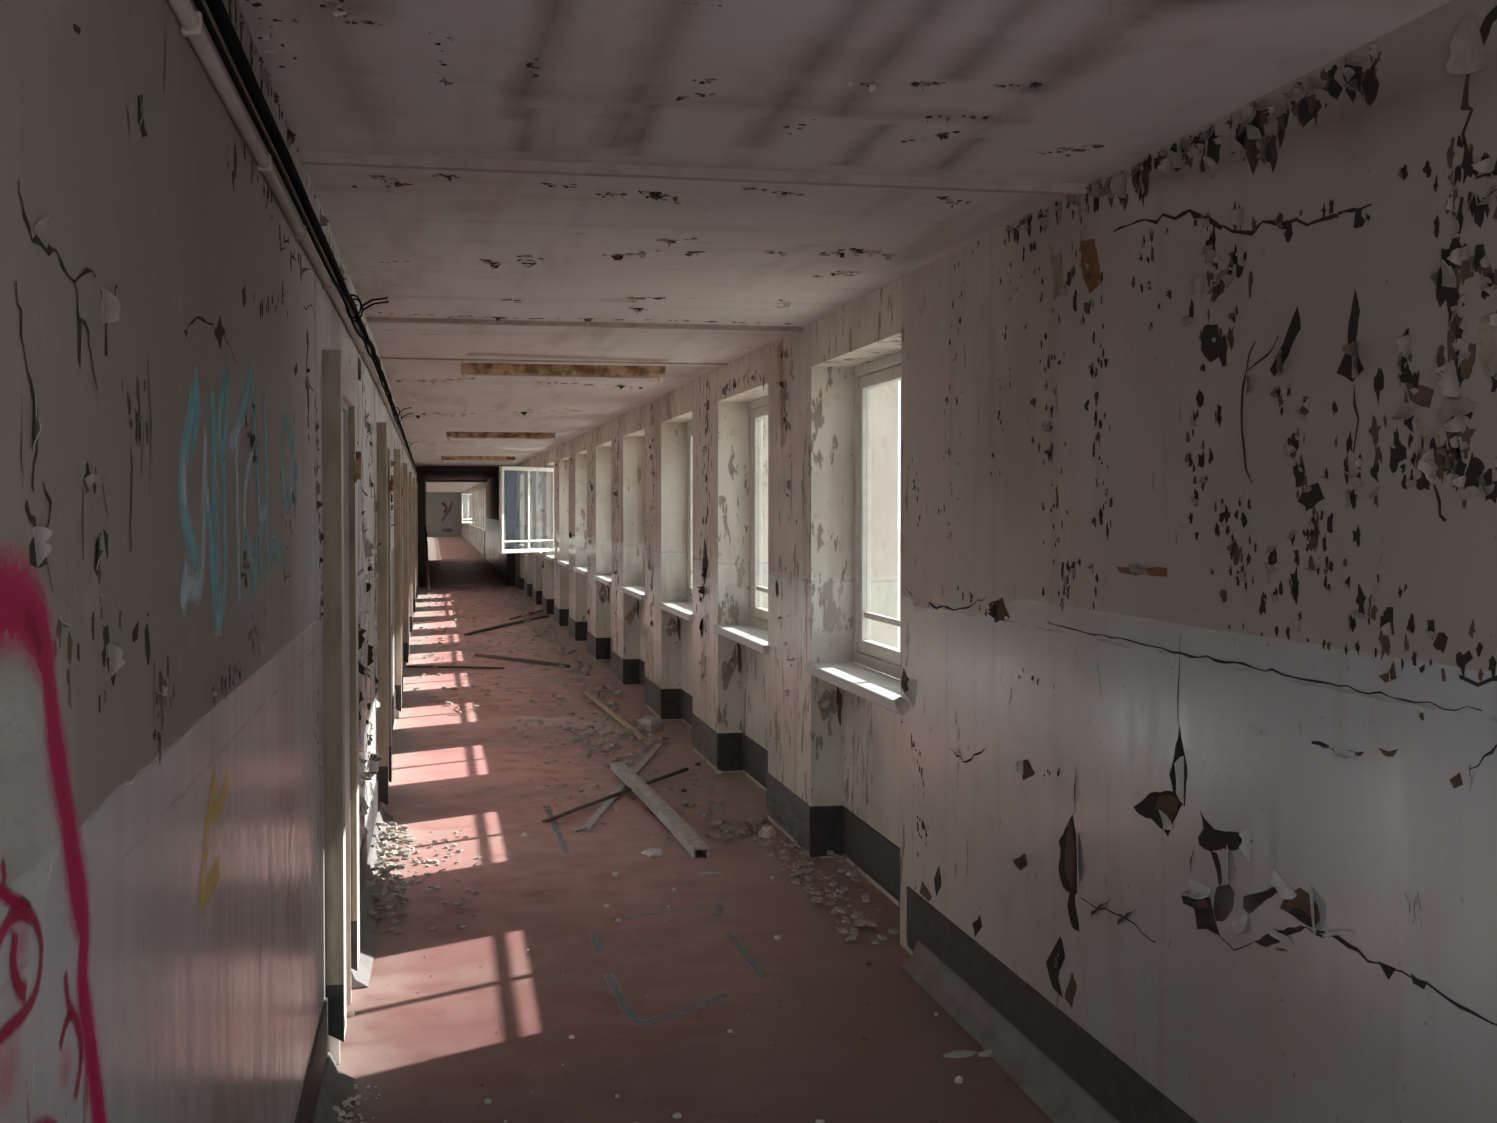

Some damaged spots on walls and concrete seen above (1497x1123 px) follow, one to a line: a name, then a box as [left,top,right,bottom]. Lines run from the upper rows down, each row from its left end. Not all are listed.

crack [16,281,41,492]
crack [19,181,98,390]
peeling [602,238,705,260]
crack [1113,199,1372,242]
spalling [26,481,53,591]
peeling [54,462,175,764]
peeling [357,385,396,839]
spalling [1013,759,1156,1008]
spalling [1133,636,1327,952]
crack [1047,622,1497,711]
crack [1316,930,1497,1026]
crack [1449,744,1497,788]